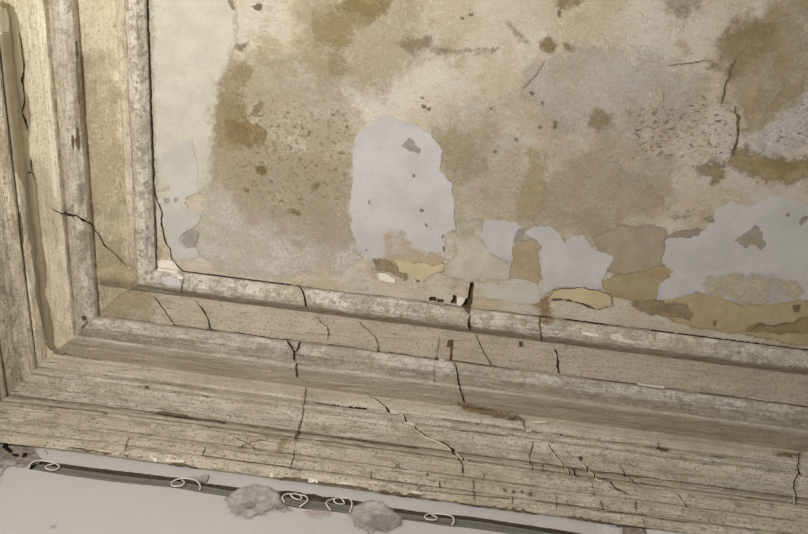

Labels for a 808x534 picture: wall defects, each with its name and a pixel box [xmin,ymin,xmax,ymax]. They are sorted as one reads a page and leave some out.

water stain [299,0,431,89]
water stain [724,0,808,132]
crack [51,208,128,268]
water stain [149,0,358,277]
peeling [235,94,456,283]
crack [130,0,808,468]
peeling [479,219,614,310]
water stain [519,145,808,346]
spalling [629,96,731,159]
peeling [657,195,808,312]
crack [370,395,502,501]
crack [520,417,646,528]